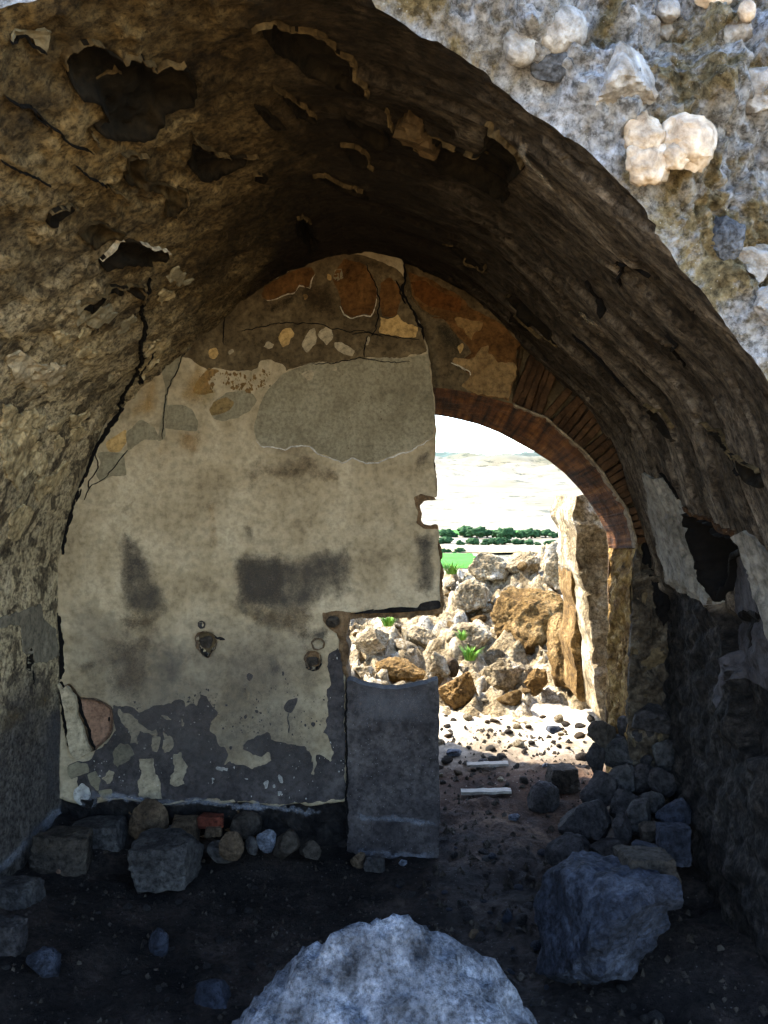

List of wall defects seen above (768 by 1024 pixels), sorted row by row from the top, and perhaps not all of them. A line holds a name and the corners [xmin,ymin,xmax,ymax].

flaking render [9,27,198,220]
flaking render [384,107,550,203]
peeling [0,403,91,541]
peeling [5,220,195,389]
crack [61,278,185,555]
crack [222,263,425,365]
peeling [96,254,558,481]
water stain [122,538,163,626]
water stain [238,549,348,629]
peeling [641,472,768,709]
crack [57,613,68,746]
peeling [57,600,441,805]